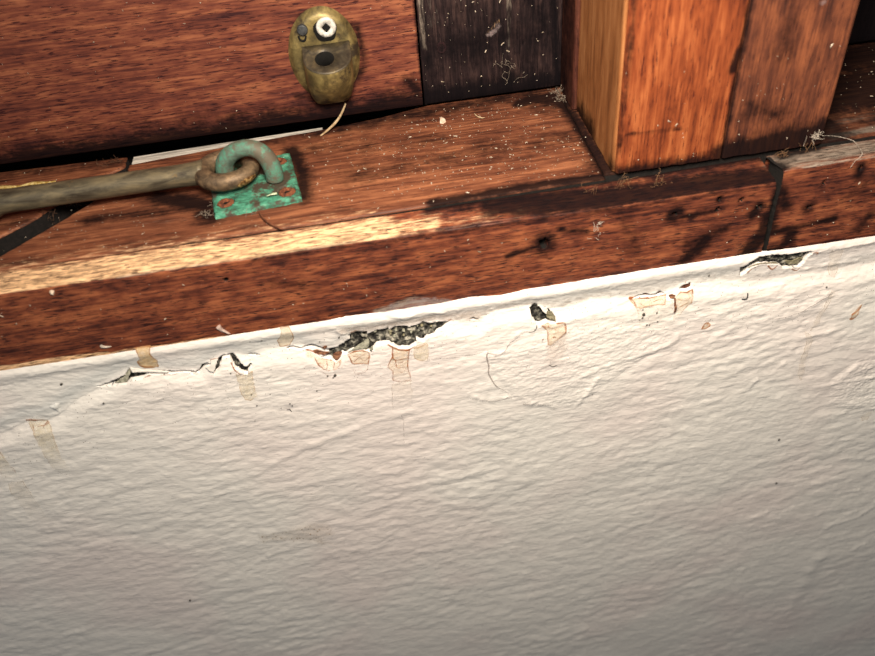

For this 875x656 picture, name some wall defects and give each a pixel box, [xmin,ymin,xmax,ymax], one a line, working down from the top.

spalling [740,251,818,273]
spalling [629,283,690,313]
spalling [530,303,556,321]
spalling [306,319,452,360]
spalling [111,367,177,383]
spalling [200,353,251,372]
crack [454,341,526,405]